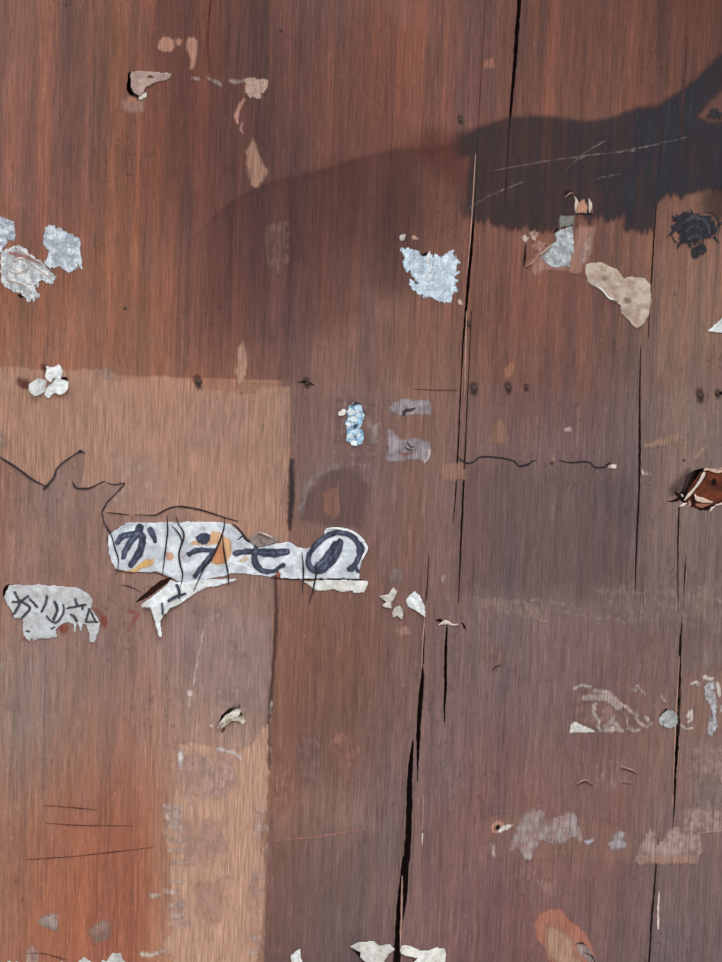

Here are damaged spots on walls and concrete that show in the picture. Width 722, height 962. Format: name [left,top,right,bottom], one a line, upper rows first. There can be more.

crack [478,0,486,128]
crack [509,0,522,119]
water stain [462,56,722,233]
peeling [0,216,82,302]
peeling [399,234,463,305]
crack [419,153,657,603]
spalling [667,468,722,512]
crack [393,557,448,962]